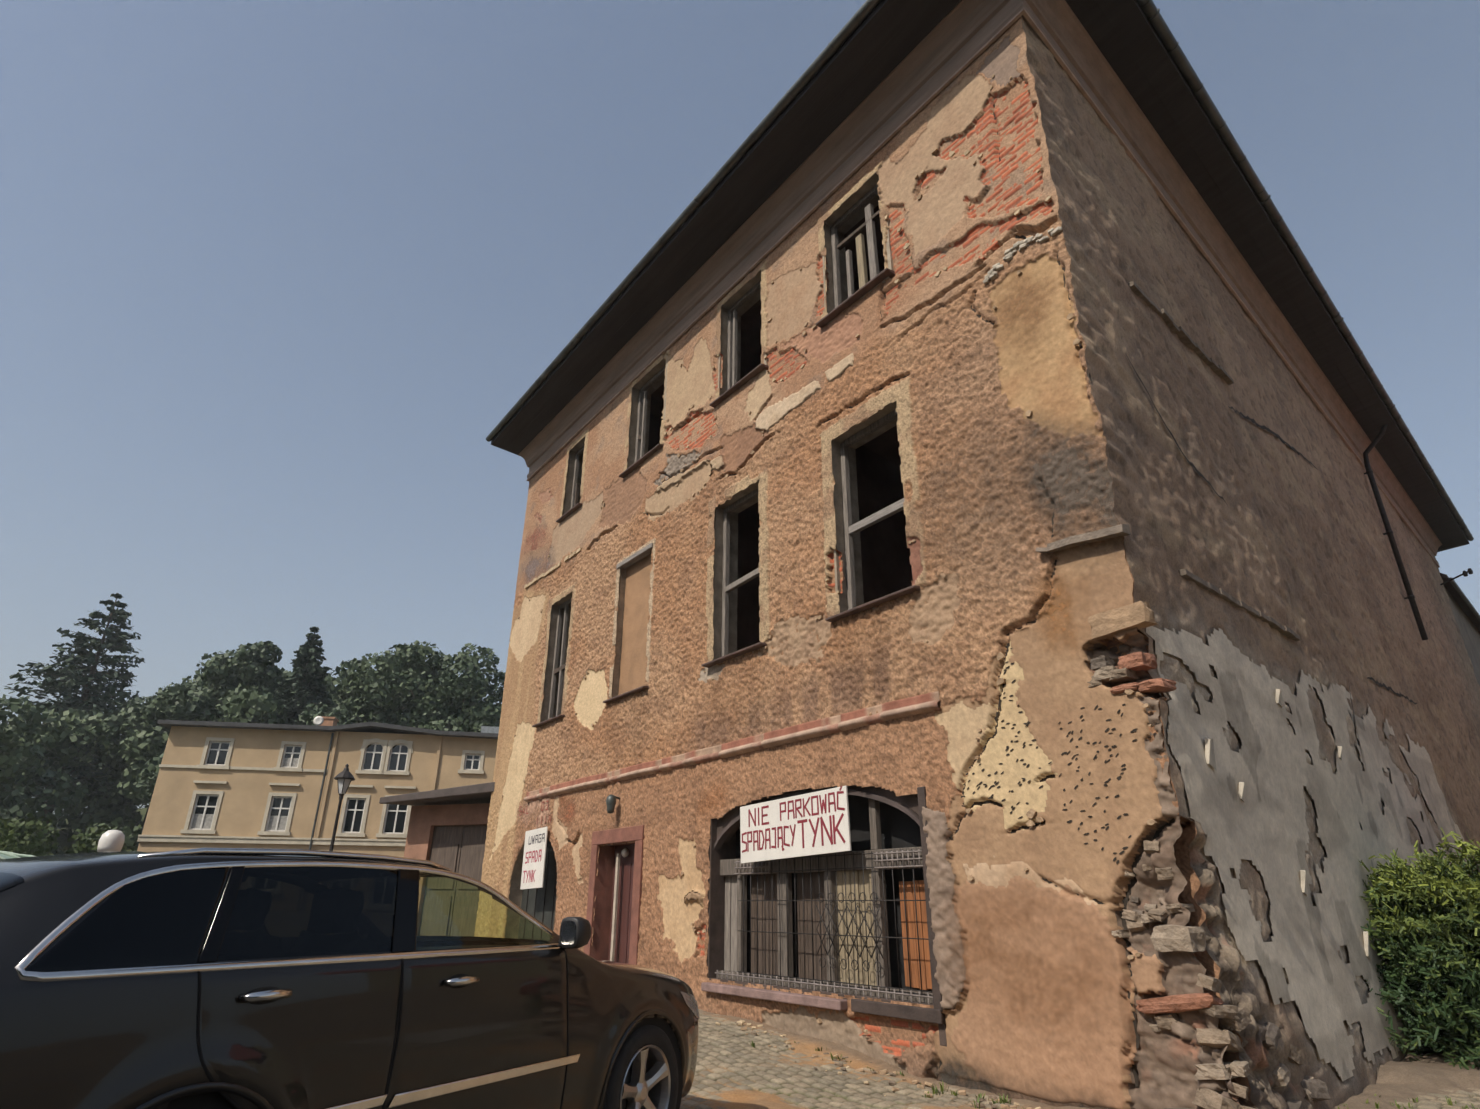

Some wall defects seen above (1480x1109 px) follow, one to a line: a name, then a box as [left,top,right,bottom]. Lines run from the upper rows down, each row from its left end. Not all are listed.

flaking render [877,74,1055,315]
flaking render [534,255,863,565]
flaking render [489,721,536,861]
flaking render [509,594,546,662]
flaking render [574,669,609,730]
flaking render [657,838,706,963]
crack [949,480,1057,839]
peeling [758,536,1470,1082]